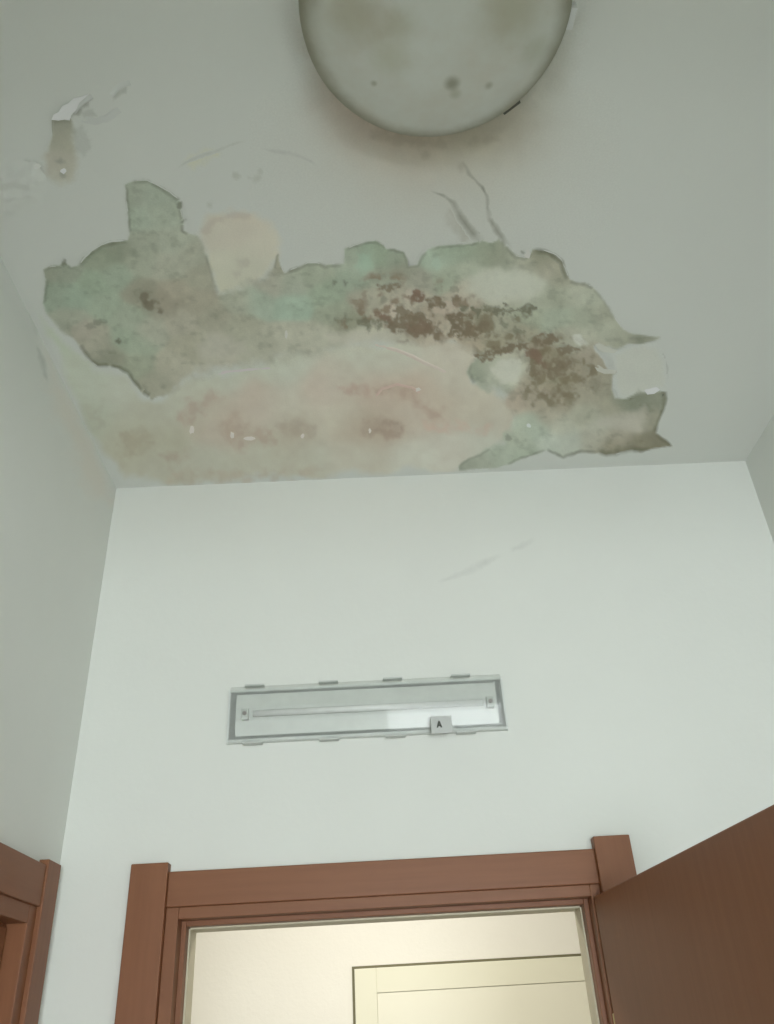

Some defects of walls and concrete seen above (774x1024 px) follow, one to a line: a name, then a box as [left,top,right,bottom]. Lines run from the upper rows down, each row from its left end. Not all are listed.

peeling [23,80,131,191]
damp [193,203,288,289]
crack [430,159,515,253]
damp [129,283,193,328]
peeling [39,174,673,473]
damp [27,302,509,513]